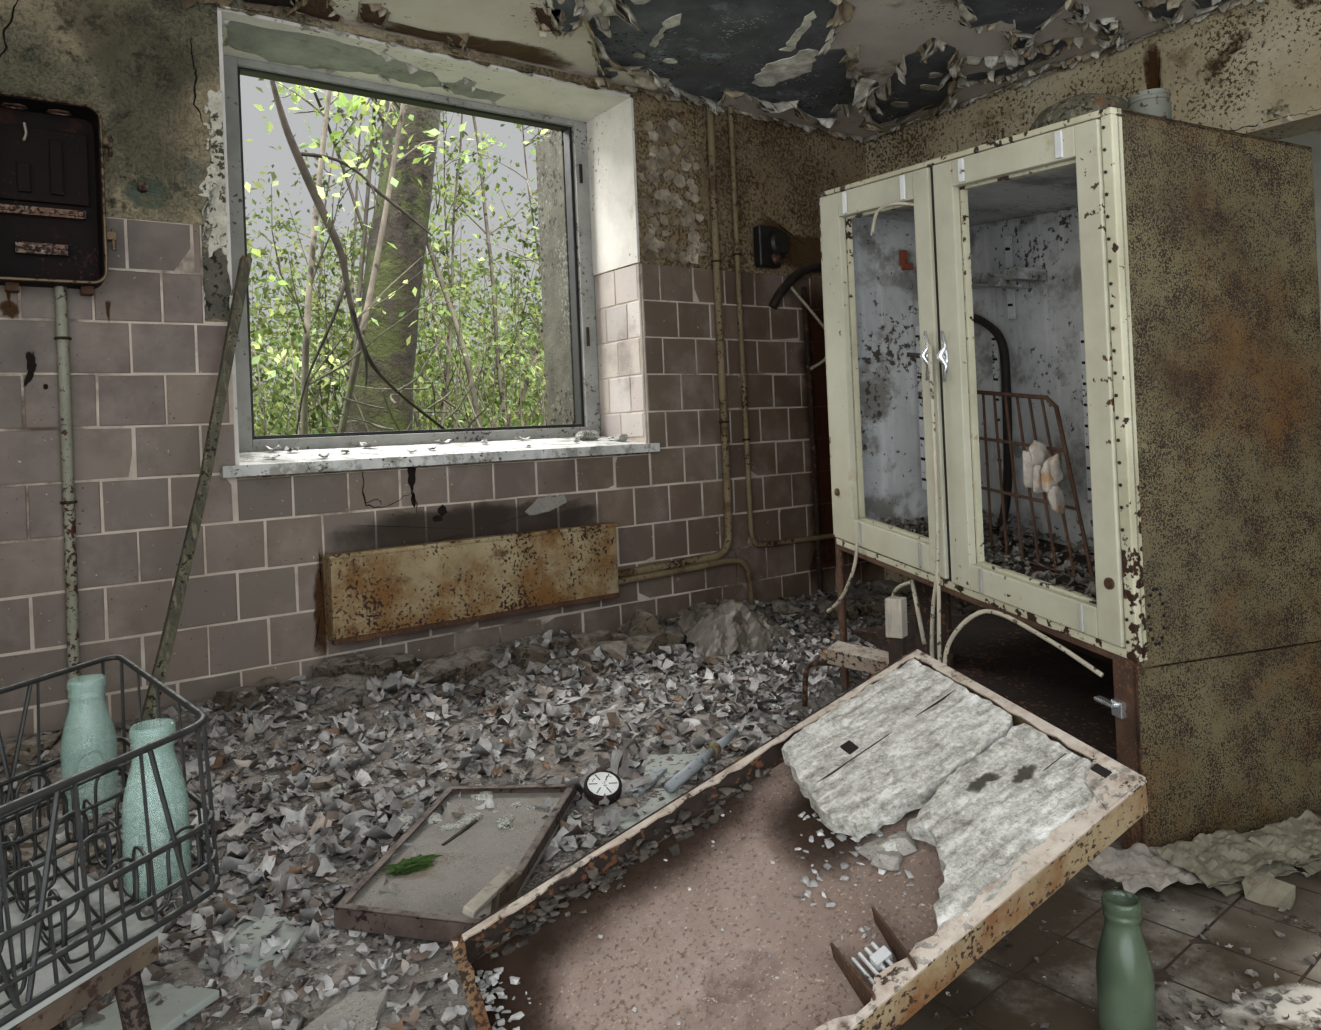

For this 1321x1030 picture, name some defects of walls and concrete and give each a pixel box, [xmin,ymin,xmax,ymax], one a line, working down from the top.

peeling [180,0,506,106]
peeling [513,0,1265,264]
damp [763,217,822,273]